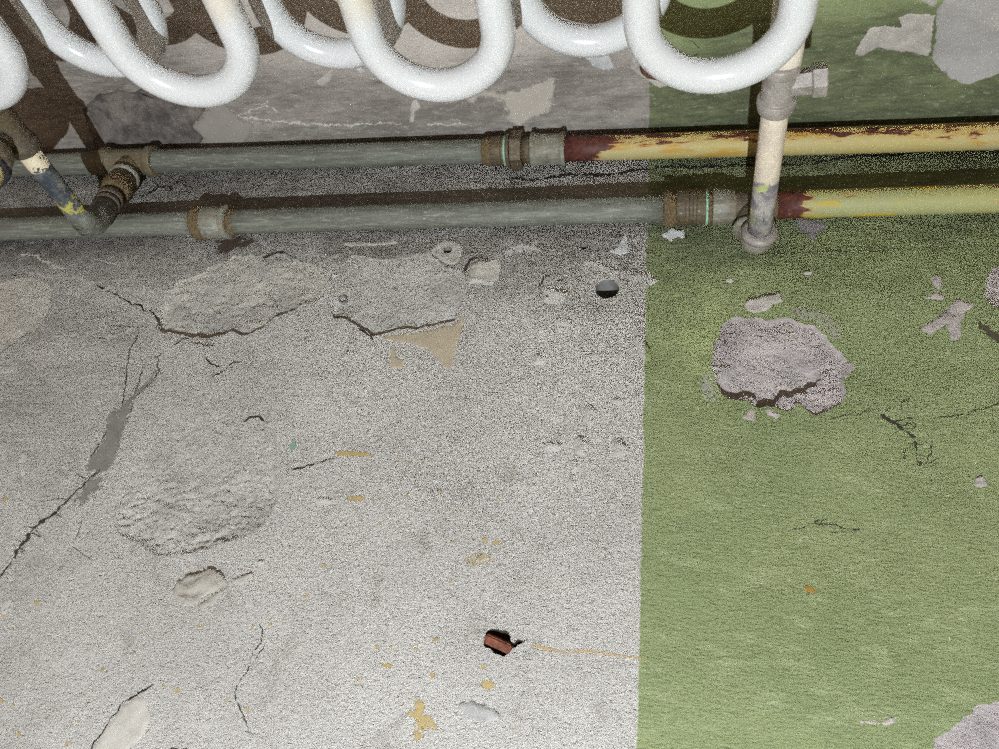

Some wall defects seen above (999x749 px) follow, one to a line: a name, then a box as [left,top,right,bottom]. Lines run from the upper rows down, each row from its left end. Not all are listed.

flaking render [856,0,999,84]
peeling [922,275,974,341]
flaking render [985,267,999,308]
crack [97,285,241,419]
flaking render [697,292,855,421]
crack [0,432,106,580]
crack [234,625,265,735]
hole [484,629,528,657]
flaking render [934,701,999,749]